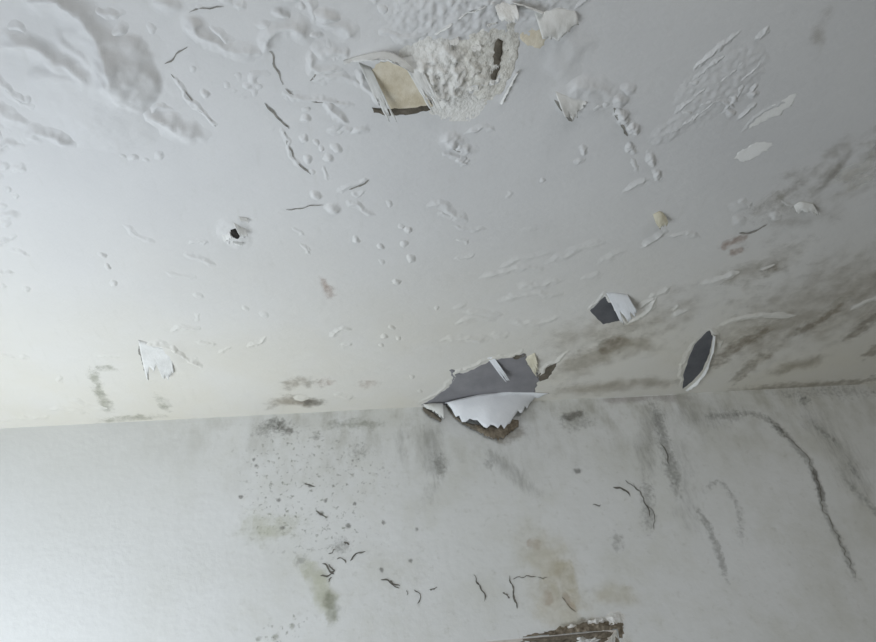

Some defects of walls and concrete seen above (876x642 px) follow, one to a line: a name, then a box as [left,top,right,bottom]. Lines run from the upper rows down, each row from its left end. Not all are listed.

peeling [343,0,612,167]
peeling [593,81,664,194]
peeling [734,142,773,162]
peeling [586,290,658,326]
peeling [138,312,232,382]
peeling [677,327,725,392]
peeling [418,348,571,441]
leakage [321,542,365,582]
spalling [519,610,625,642]